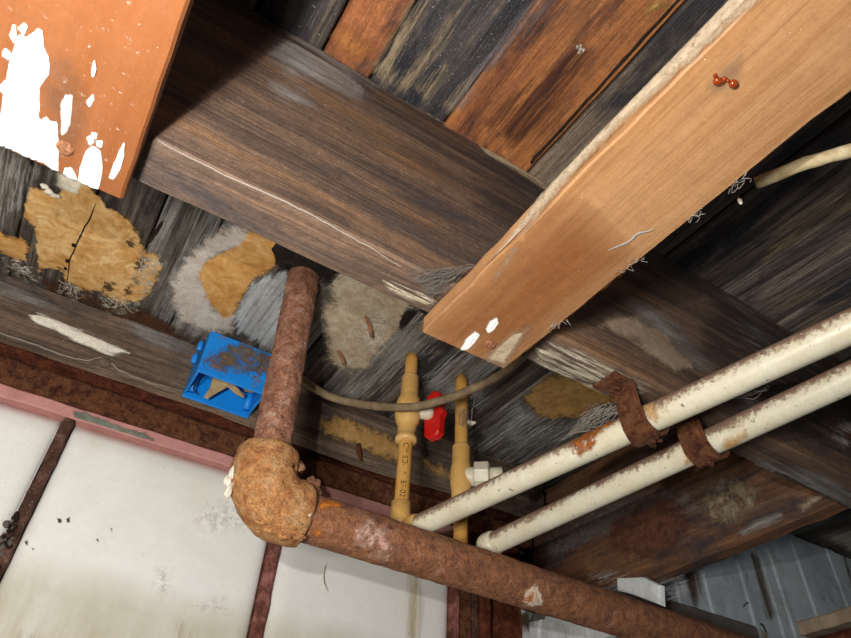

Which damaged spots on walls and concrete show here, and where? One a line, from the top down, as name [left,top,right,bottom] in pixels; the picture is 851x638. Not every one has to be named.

peeling [0,23,125,189]
crack [64,203,96,279]
corrosion [223,266,752,638]